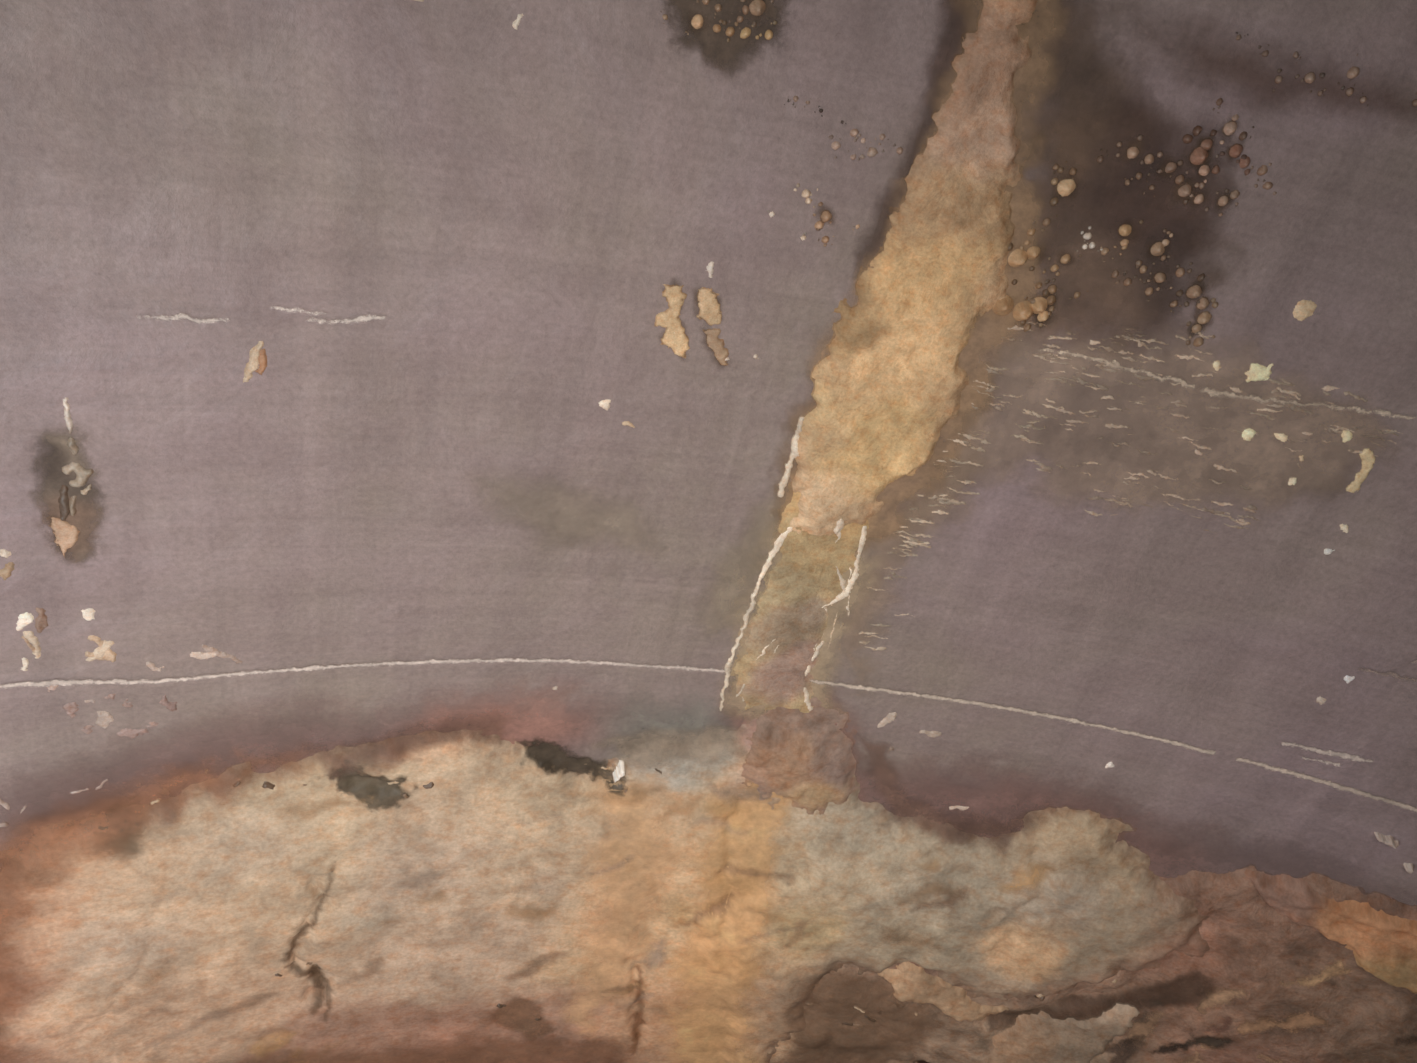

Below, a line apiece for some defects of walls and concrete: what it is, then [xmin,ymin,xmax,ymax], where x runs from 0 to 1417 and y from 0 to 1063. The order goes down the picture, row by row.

rust [660,0,784,71]
peeling [654,262,730,366]
rust [719,0,1277,714]
peeling [877,712,897,728]
crack [329,761,408,809]
crack [521,740,626,795]
peeling [613,760,625,782]
rust [0,708,1417,1063]
peeling [1374,832,1414,874]
crack [287,906,328,1009]